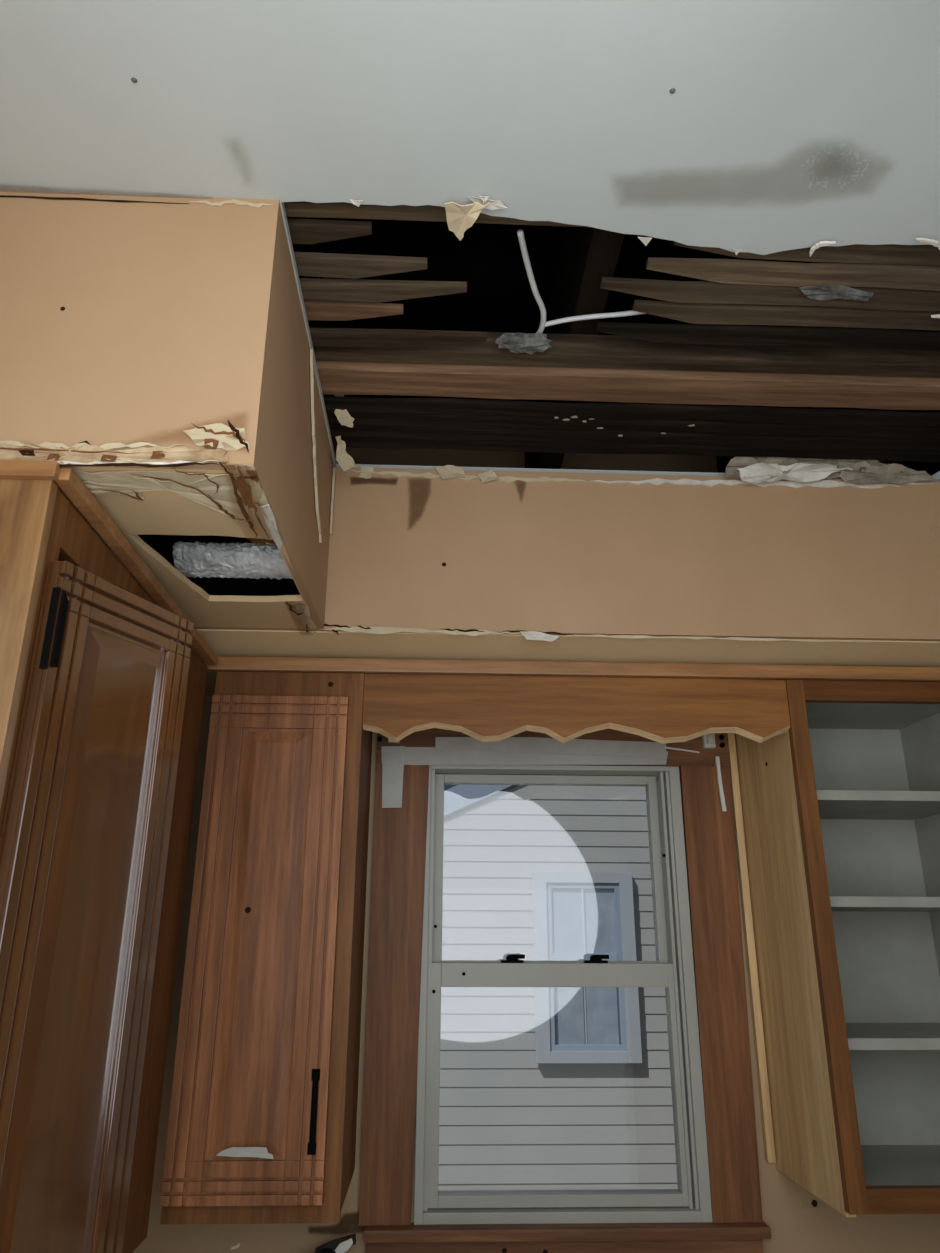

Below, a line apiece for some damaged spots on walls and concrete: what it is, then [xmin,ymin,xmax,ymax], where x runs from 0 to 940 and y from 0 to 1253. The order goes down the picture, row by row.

peeling [445,195,507,241]
crack [0,421,270,540]
peeling [0,423,282,552]
flaking render [347,457,936,489]